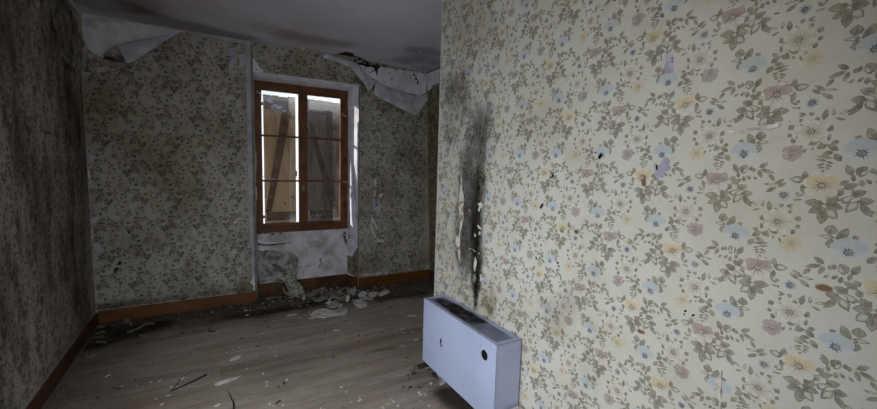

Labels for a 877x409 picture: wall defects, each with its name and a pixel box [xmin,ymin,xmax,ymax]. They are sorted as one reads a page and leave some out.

flaking render [81,13,186,58]
flaking render [323,54,440,96]
water stain [436,116,488,323]